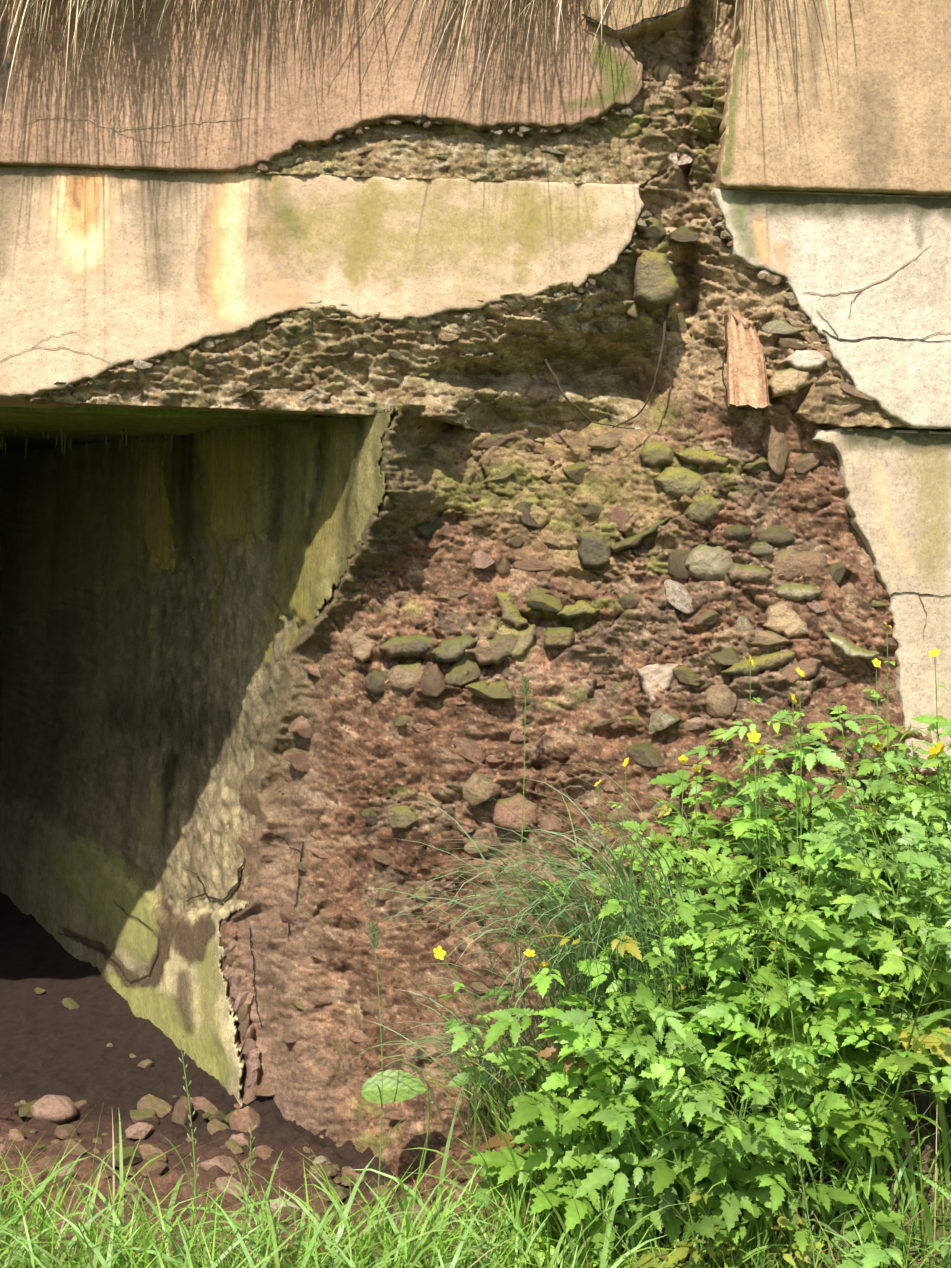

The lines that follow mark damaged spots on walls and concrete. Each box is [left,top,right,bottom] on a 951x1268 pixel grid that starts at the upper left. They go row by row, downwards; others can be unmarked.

spalling [233,104,663,187]
corrosion [49,174,111,274]
corrosion [208,172,255,324]
spalling [22,210,668,442]
spalling [709,208,733,247]
spalling [756,268,908,429]
crack [803,245,951,342]
damp [53,840,163,961]
crack [58,900,161,983]
crack [182,858,246,903]
crack [268,832,304,938]
peeling [63,898,261,1104]